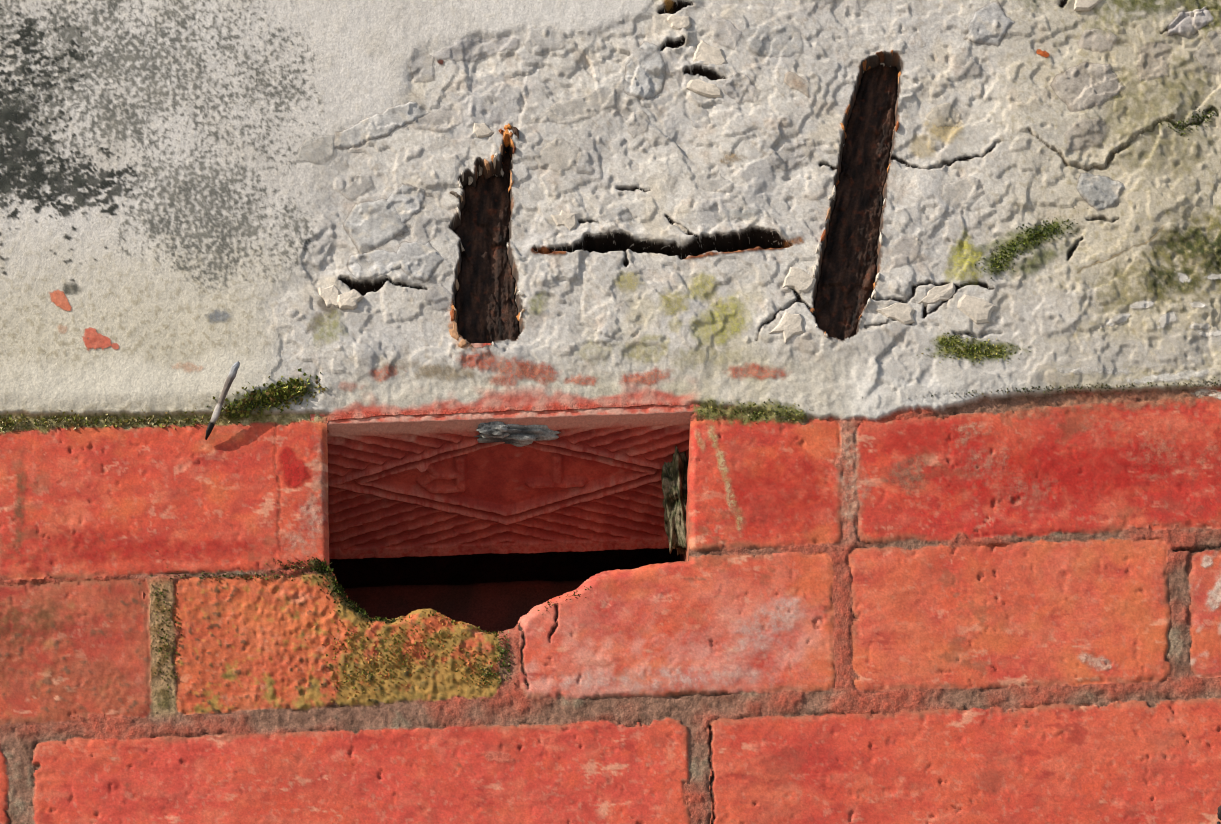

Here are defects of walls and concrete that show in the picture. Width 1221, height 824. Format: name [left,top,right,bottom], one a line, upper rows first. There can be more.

leakage [0,0,320,285]
crack [1030,131,1123,171]
crack [1150,106,1219,132]
spalling [270,0,1221,467]
leakage [209,310,229,321]
crack [339,277,427,296]
crack [756,289,816,341]
crack [864,281,1001,339]
spalling [173,565,502,715]
crack [518,611,558,689]
spalling [518,552,836,701]